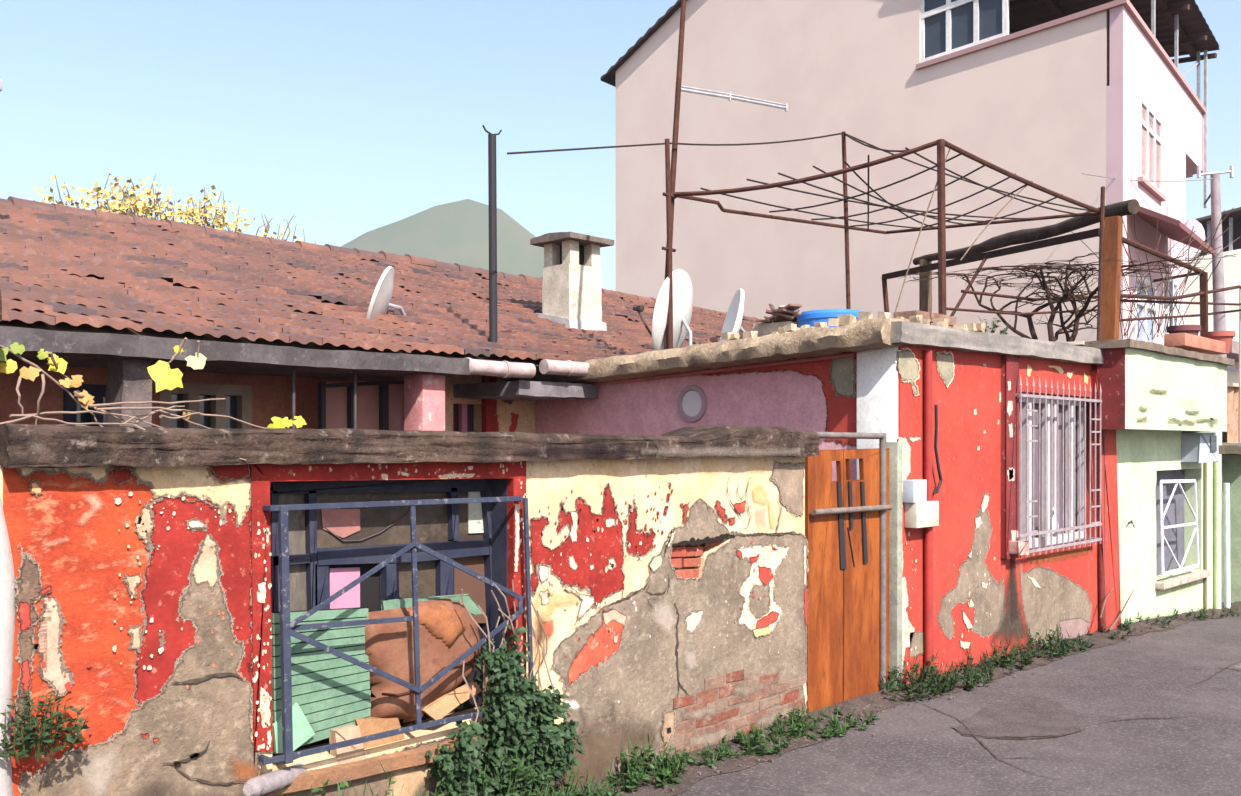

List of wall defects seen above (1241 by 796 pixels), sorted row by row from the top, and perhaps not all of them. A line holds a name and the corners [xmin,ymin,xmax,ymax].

spalling [497,318,920,447]
flaking render [936,351,955,388]
peeling [977,381,1013,451]
peeling [898,436,921,507]
flaking render [13,464,273,796]
flaking render [500,461,809,776]
peeling [902,532,924,677]
flaking render [938,493,1006,664]
flaking render [1020,563,1093,647]
crack [171,673,243,684]
crack [163,740,246,786]
flaking render [274,746,504,796]